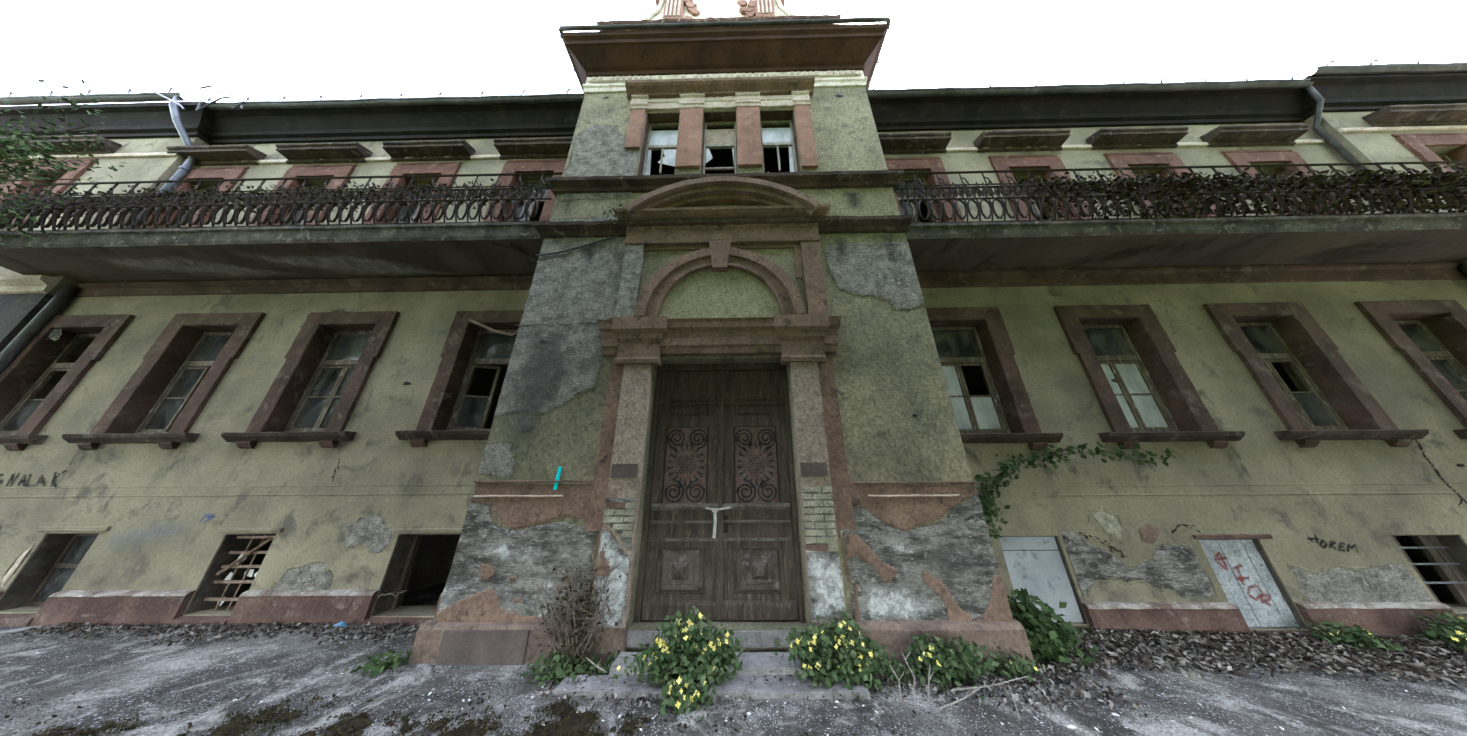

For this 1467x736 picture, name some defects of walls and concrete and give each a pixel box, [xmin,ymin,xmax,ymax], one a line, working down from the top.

flaking render [439,498,636,627]
flaking render [802,485,1000,624]
flaking render [1061,506,1218,602]